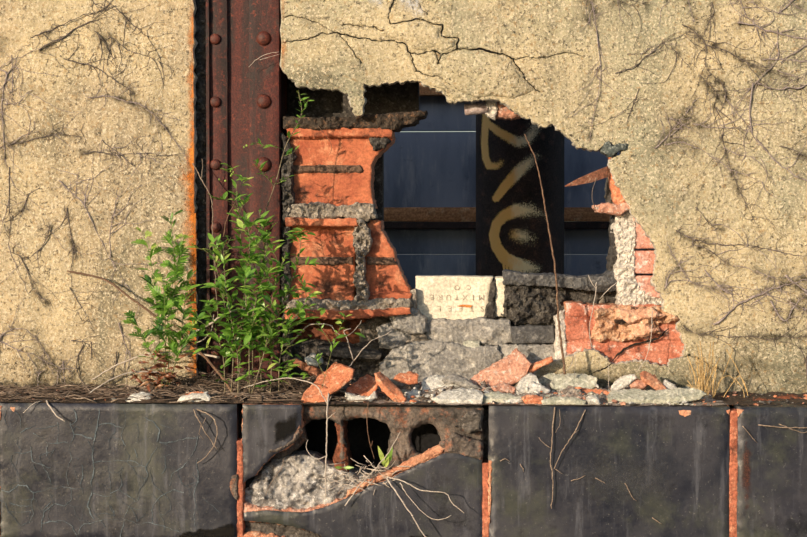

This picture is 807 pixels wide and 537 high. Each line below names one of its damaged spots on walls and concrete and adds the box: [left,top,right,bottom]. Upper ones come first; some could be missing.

crack [284,0,580,92]
corrosion [186,64,197,376]
spalling [280,58,686,395]
crack [0,409,220,537]
spalling [268,425,303,453]
spalling [229,445,445,537]
peeling [521,394,543,404]